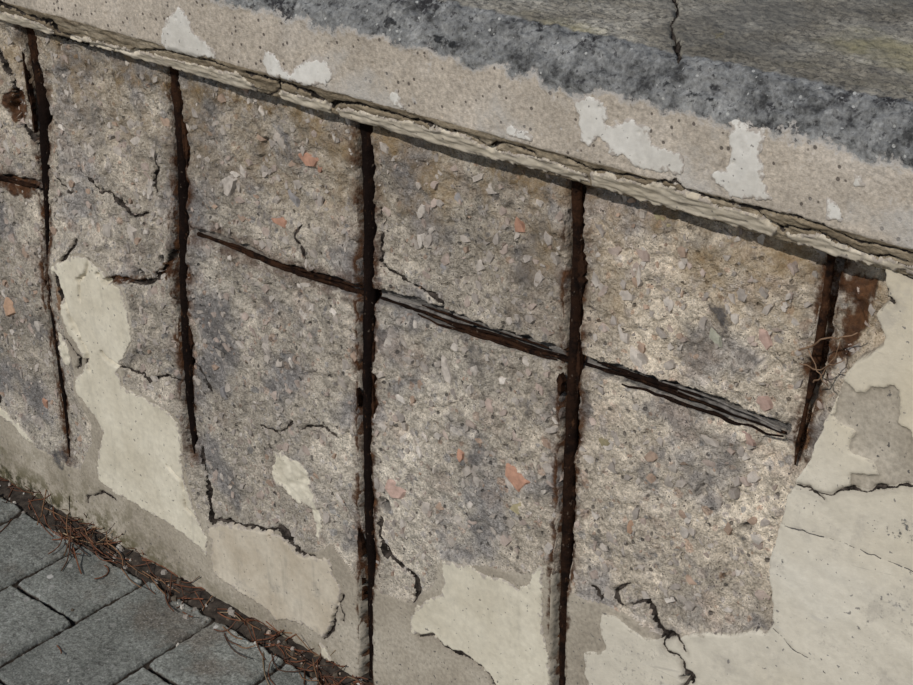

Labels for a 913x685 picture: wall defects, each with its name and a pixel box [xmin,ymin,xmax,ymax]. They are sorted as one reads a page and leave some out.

peeling [262,50,332,87]
crack [134,48,536,155]
corrosion [0,175,40,199]
crack [55,239,89,301]
crack [52,156,160,218]
spalling [0,6,257,556]
crack [379,207,445,306]
spalling [115,67,913,685]
crack [567,157,913,304]
corrosion [827,273,878,376]
crack [797,483,913,500]
crack [591,582,696,685]